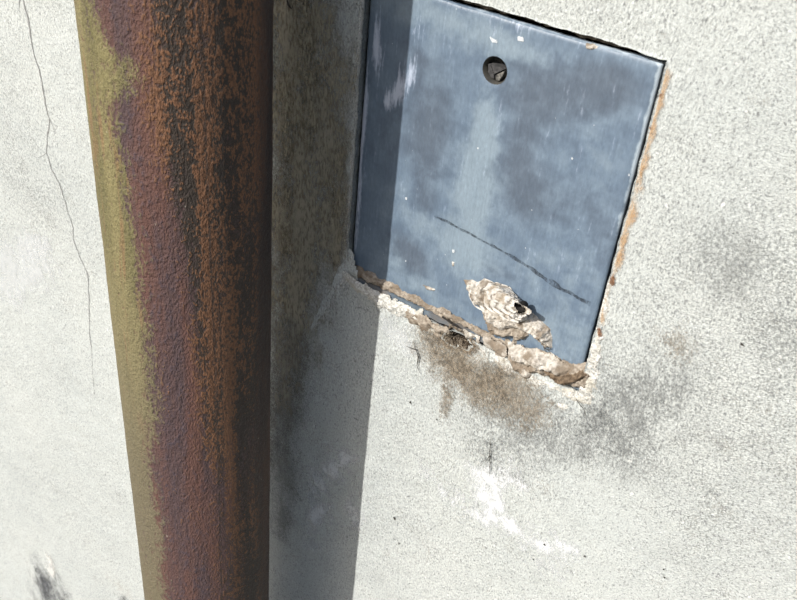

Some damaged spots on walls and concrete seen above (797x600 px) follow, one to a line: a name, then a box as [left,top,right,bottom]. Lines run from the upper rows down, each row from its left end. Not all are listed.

crack [19,0,94,387]
spalling [425,279,610,410]
damp [438,457,581,560]
damp [36,554,69,600]